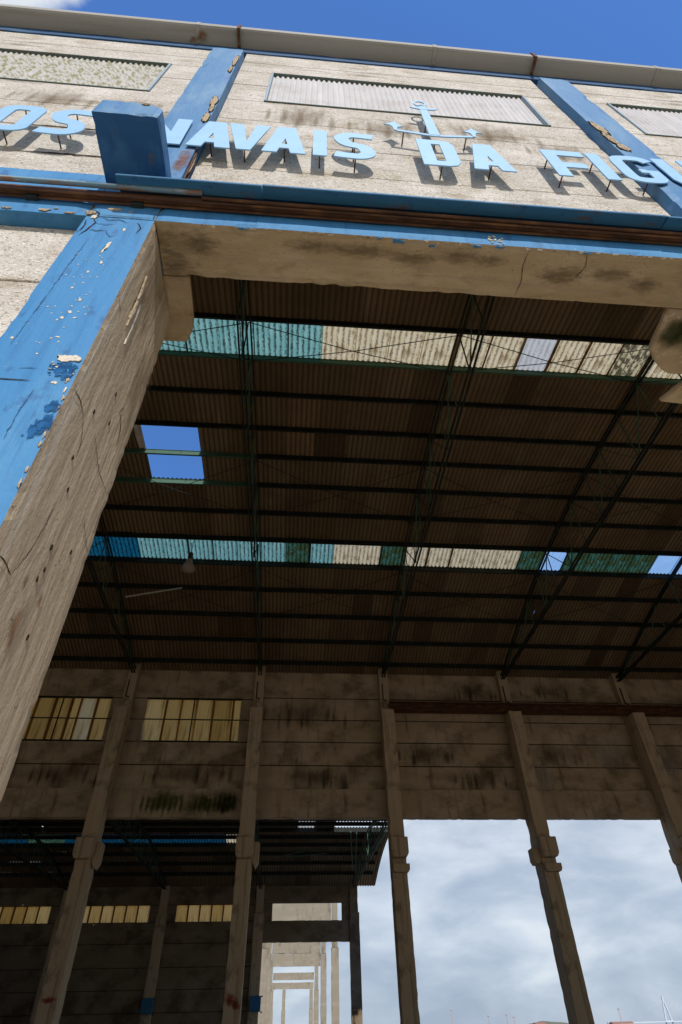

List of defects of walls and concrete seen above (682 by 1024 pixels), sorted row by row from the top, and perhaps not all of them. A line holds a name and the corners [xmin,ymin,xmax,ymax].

spalling [201,95,219,123]
spalling [587,121,632,153]
spalling [39,208,133,219]
crack [13,215,155,340]
spalling [124,276,147,344]
peeling [21,242,112,447]